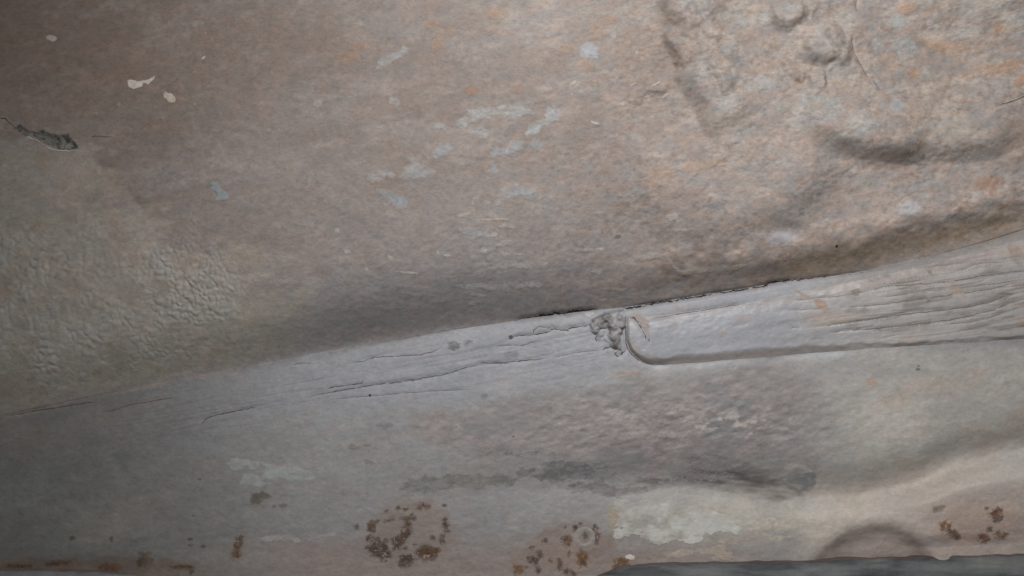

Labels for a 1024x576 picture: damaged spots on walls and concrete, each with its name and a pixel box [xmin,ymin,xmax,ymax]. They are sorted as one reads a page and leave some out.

spalling [0,117,80,153]
crack [309,262,1024,400]
crack [9,397,175,416]
crack [199,407,255,428]
leakage [399,445,810,542]
corrosion [352,493,462,569]
corrosion [505,518,638,576]
corrosion [928,495,1024,551]